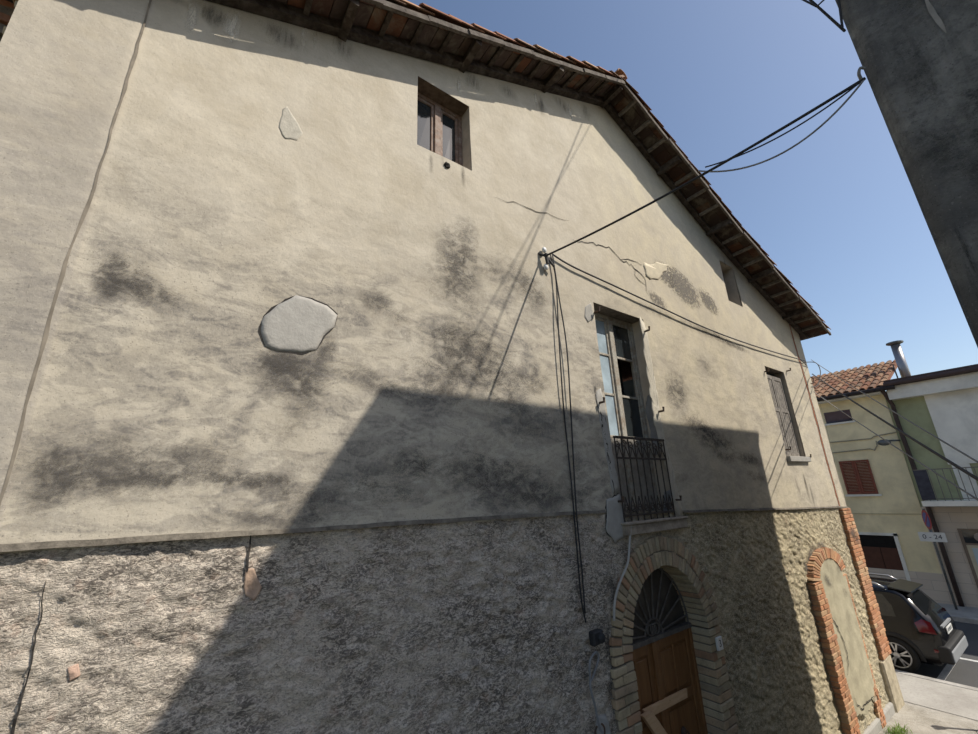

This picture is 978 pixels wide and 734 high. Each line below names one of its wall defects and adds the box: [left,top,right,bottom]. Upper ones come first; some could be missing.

water stain [100,260,169,299]
water stain [443,240,473,293]
crack [580,241,646,285]
water stain [262,343,332,396]
water stain [424,331,511,393]
water stain [37,443,283,492]
crack [7,582,46,734]